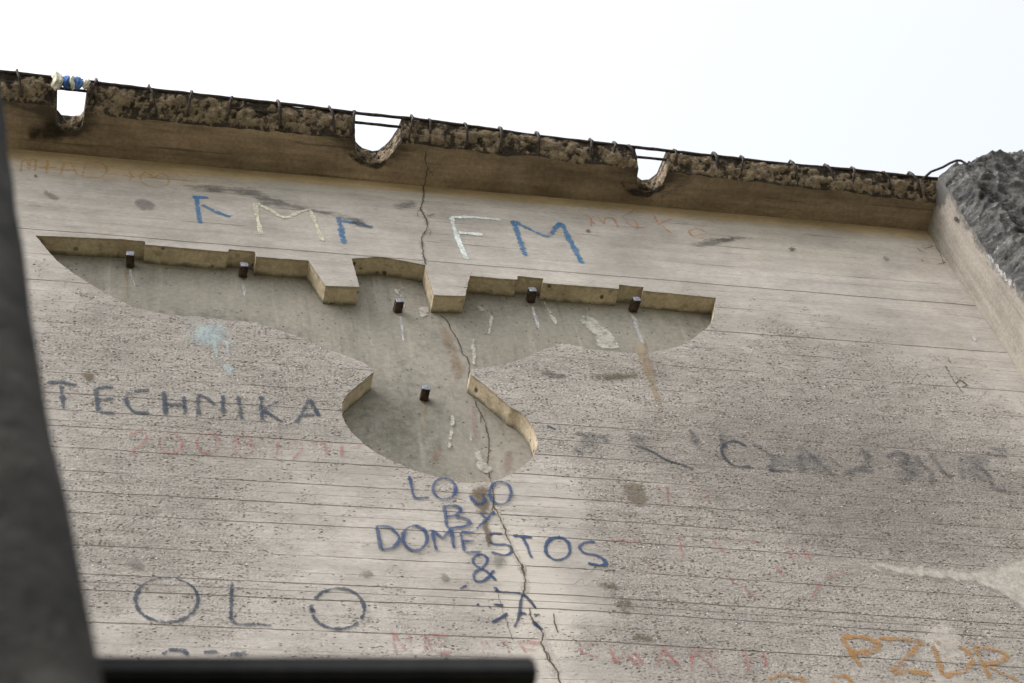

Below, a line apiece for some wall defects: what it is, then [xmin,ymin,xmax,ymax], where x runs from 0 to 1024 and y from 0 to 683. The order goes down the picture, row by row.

spalling [0,69,938,203]
crack [417,152,433,264]
crack [440,315,561,683]